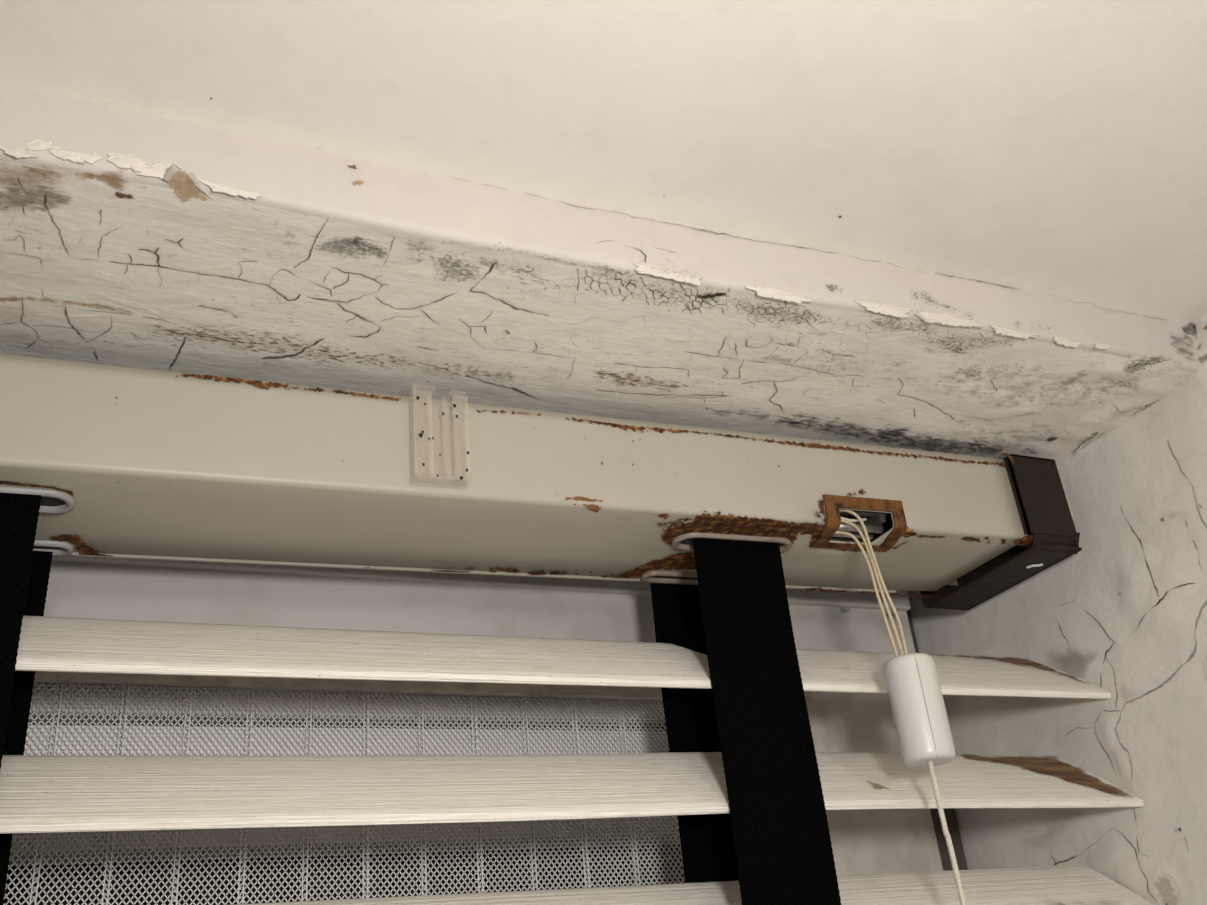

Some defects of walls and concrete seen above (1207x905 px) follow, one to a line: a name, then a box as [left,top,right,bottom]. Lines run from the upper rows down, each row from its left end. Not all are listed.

peeling [0,139,262,202]
damp [323,238,386,258]
crack [0,178,955,420]
corrosion [175,373,401,401]
corrosion [566,417,1007,468]
damp [784,416,999,453]
corrosion [0,481,74,497]
corrosion [565,496,602,513]
corrosion [50,535,113,558]
corrosion [490,500,827,579]
crack [1059,507,1204,772]
crack [1054,808,1154,898]